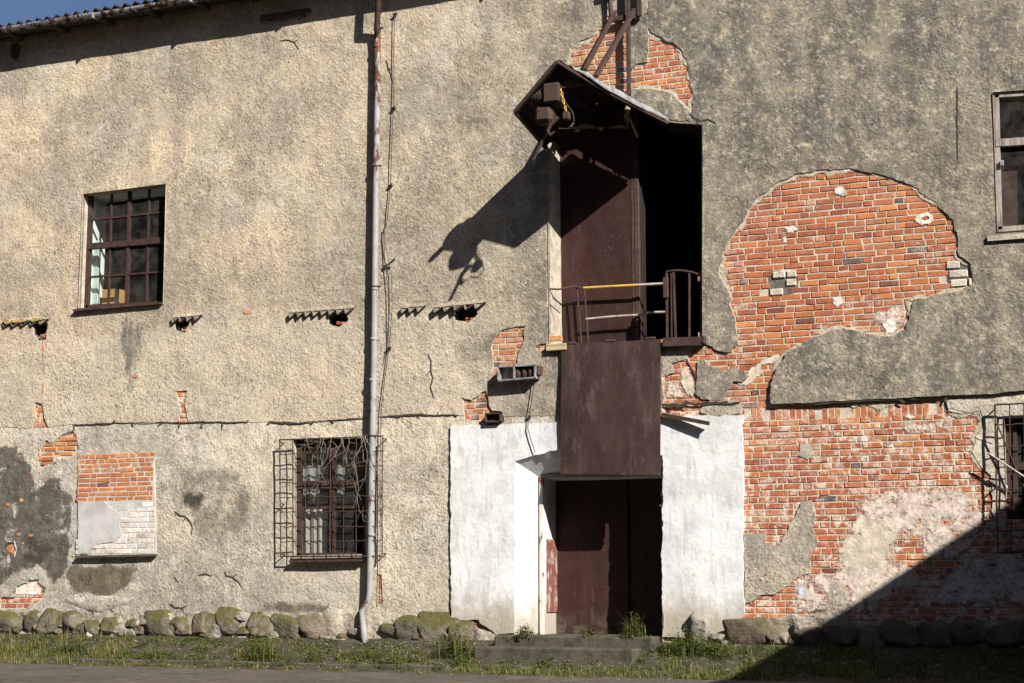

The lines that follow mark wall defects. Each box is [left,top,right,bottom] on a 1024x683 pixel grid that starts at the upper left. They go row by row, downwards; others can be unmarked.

flaking render [567,0,693,132]
flaking render [29,323,78,480]
flaking render [176,391,199,423]
crack [70,354,457,433]
flaking render [457,326,526,424]
flaking render [661,168,1024,623]
water stain [0,446,134,596]
flaking render [1,579,45,610]